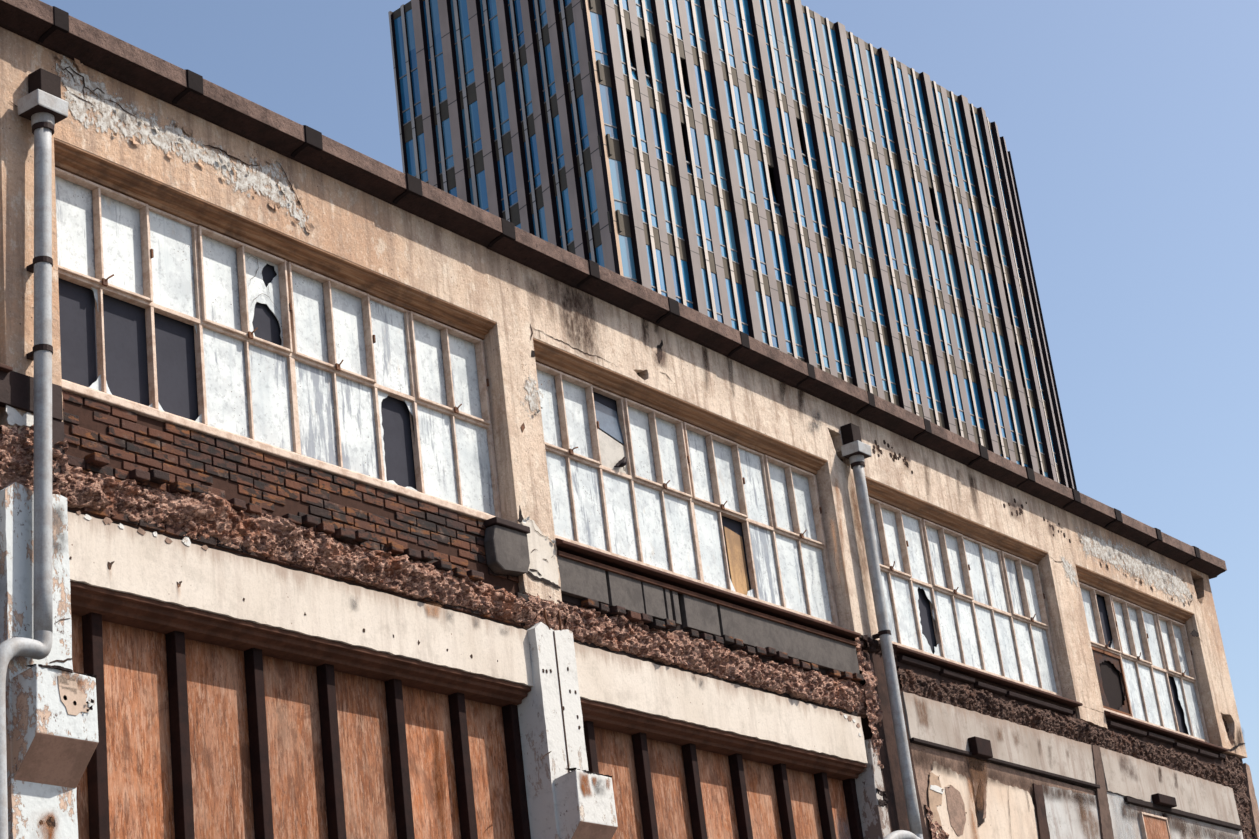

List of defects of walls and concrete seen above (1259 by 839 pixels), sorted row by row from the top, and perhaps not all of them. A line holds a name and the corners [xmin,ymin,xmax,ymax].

peeling [55,54,315,234]
spalling [655,324,666,365]
peeling [521,373,543,433]
spalling [0,405,34,491]
spalling [52,440,1243,790]
peeling [27,664,97,716]
spalling [39,814,55,831]
spalling [876,788,888,807]
peeling [924,772,987,839]